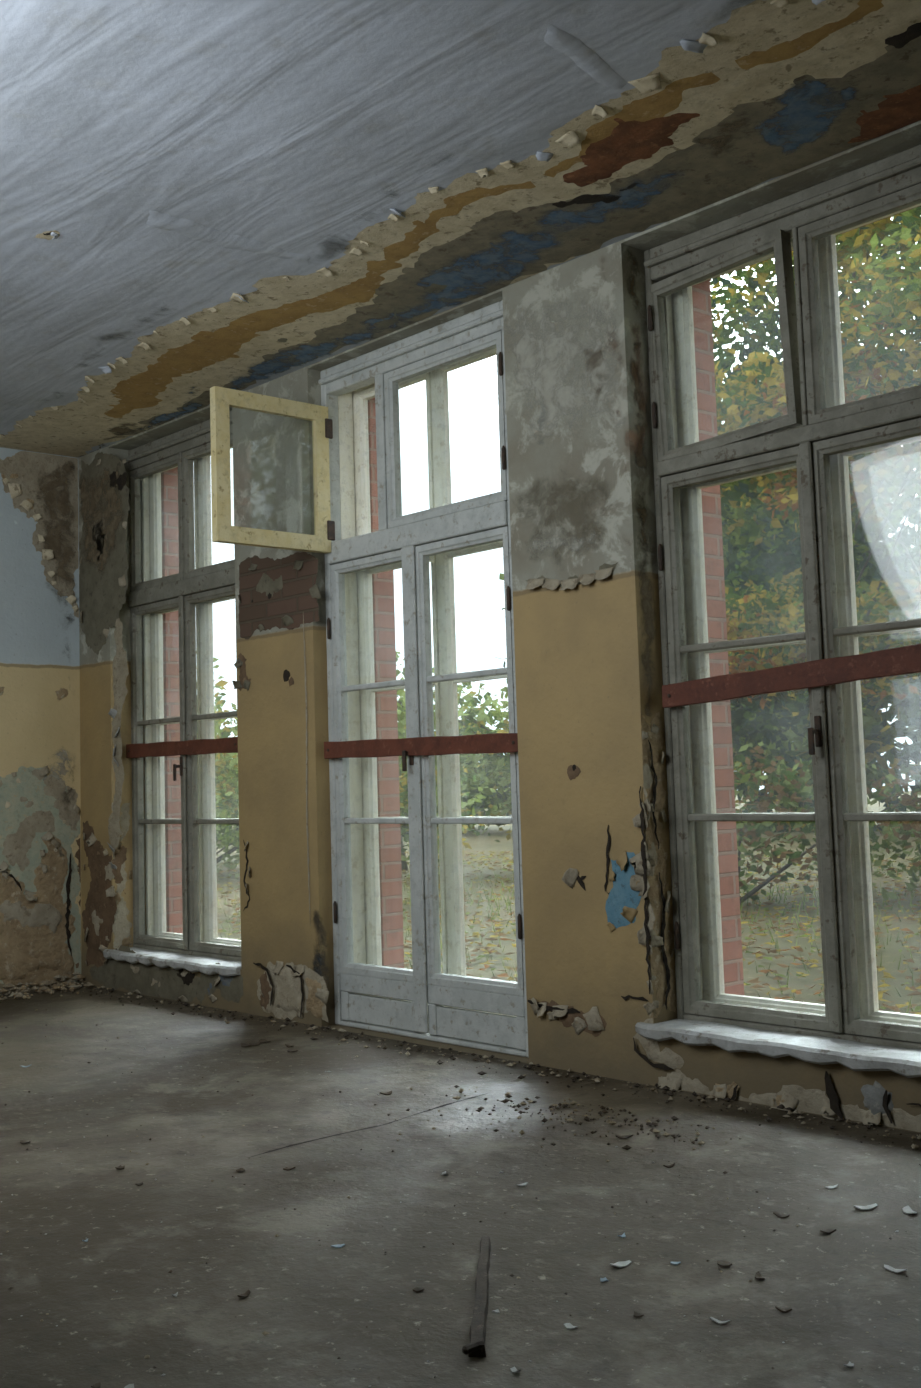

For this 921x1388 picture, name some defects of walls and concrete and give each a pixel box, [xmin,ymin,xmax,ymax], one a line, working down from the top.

damp [509,302,647,468]
peeling [0,0,921,1023]
damp [636,498,655,716]
flaking render [528,997,607,1037]
flaking render [604,706,921,1132]